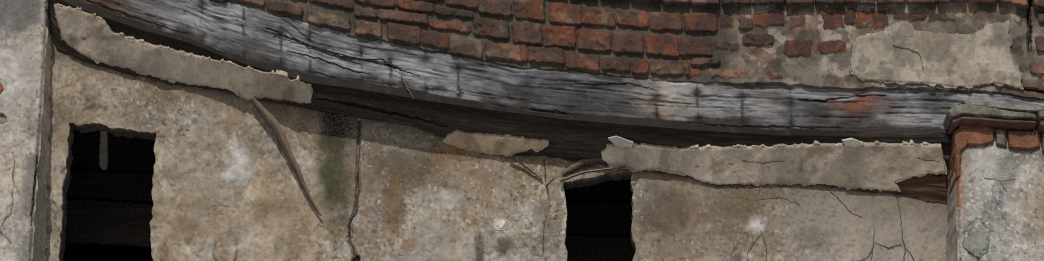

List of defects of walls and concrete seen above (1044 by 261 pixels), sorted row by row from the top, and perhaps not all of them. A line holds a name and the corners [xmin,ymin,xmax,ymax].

crack [1025,0,1033,52]
crack [0,153,38,244]
crack [349,122,360,261]
crack [830,191,915,261]
flaking render [897,173,947,204]